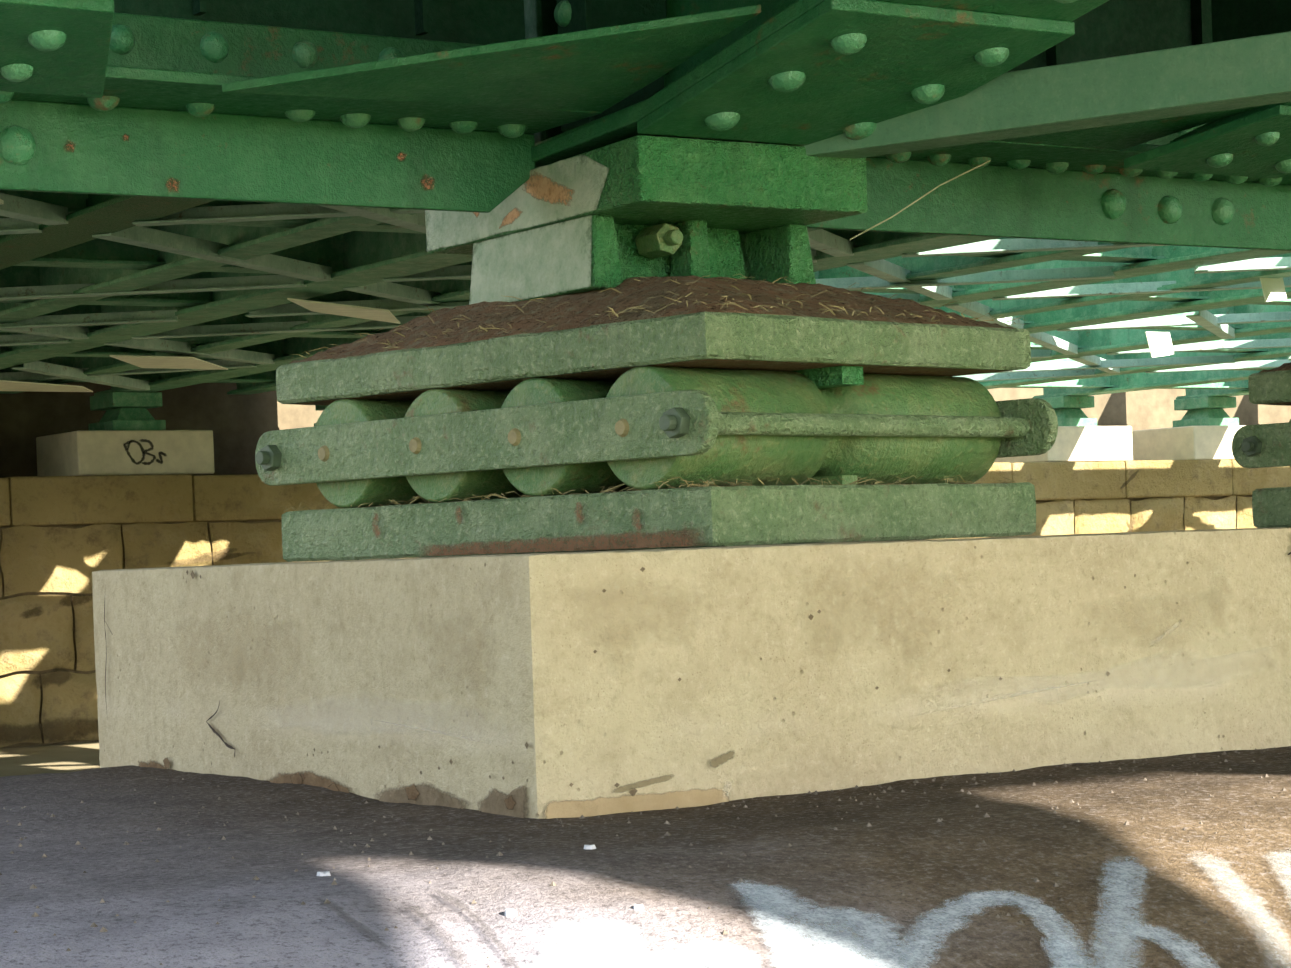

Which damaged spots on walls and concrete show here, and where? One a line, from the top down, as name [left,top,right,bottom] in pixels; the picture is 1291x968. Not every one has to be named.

peeling [425,154,609,305]
corrosion [424,503,698,556]
crack [206,702,235,757]